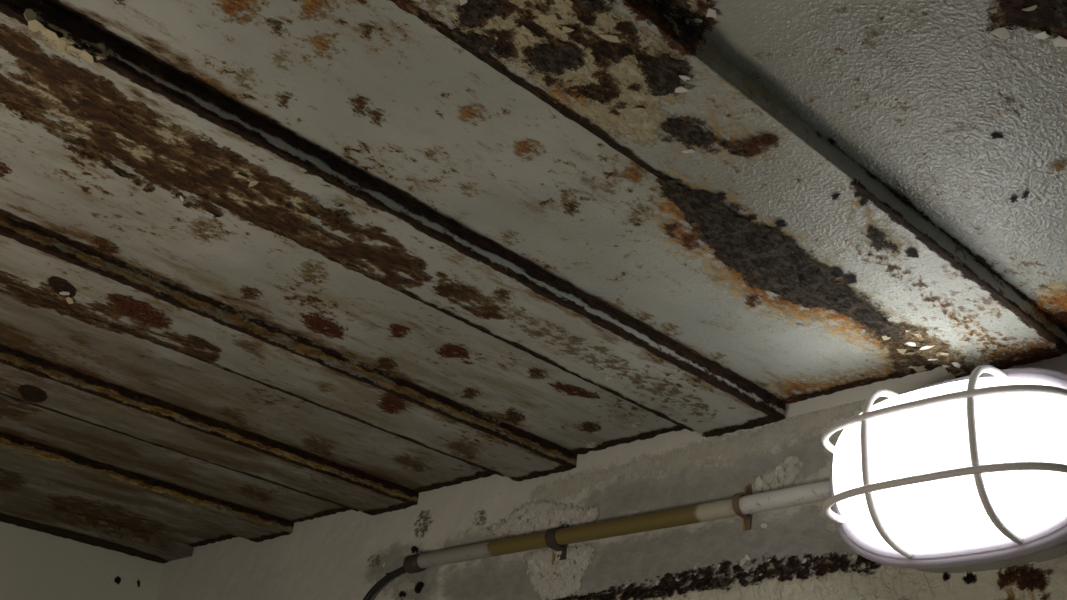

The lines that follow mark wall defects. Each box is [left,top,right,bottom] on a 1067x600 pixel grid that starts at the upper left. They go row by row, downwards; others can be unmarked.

rust [0,0,943,542]
rust [827,138,1067,377]
rust [0,494,171,564]
rust [189,534,238,547]
spalling [366,546,438,600]
peeling [522,543,595,600]
rust [997,563,1054,600]